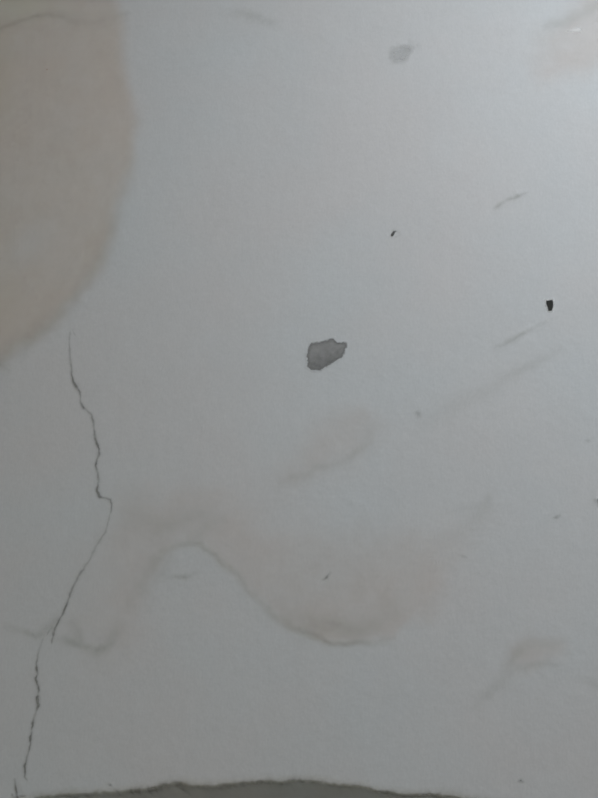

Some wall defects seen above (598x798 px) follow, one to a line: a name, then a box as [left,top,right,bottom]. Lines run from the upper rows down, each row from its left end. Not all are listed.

peeling [305,336,349,373]
crack [29,666,40,742]